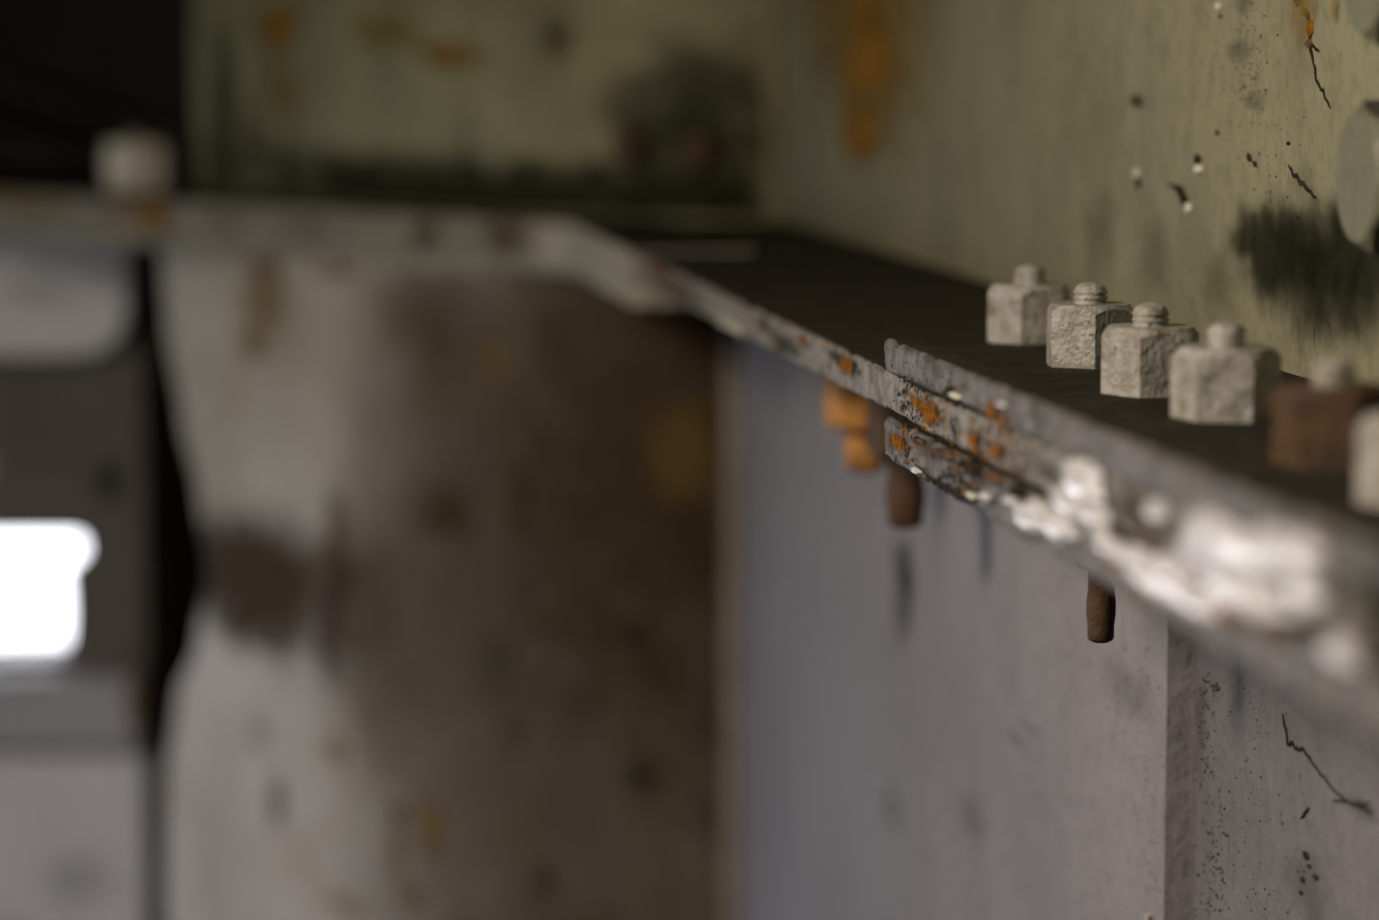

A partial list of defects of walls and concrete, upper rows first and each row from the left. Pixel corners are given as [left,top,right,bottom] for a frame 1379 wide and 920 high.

crack [1294,0,1330,108]
rust [885,358,1075,511]
crack [1282,714,1373,819]